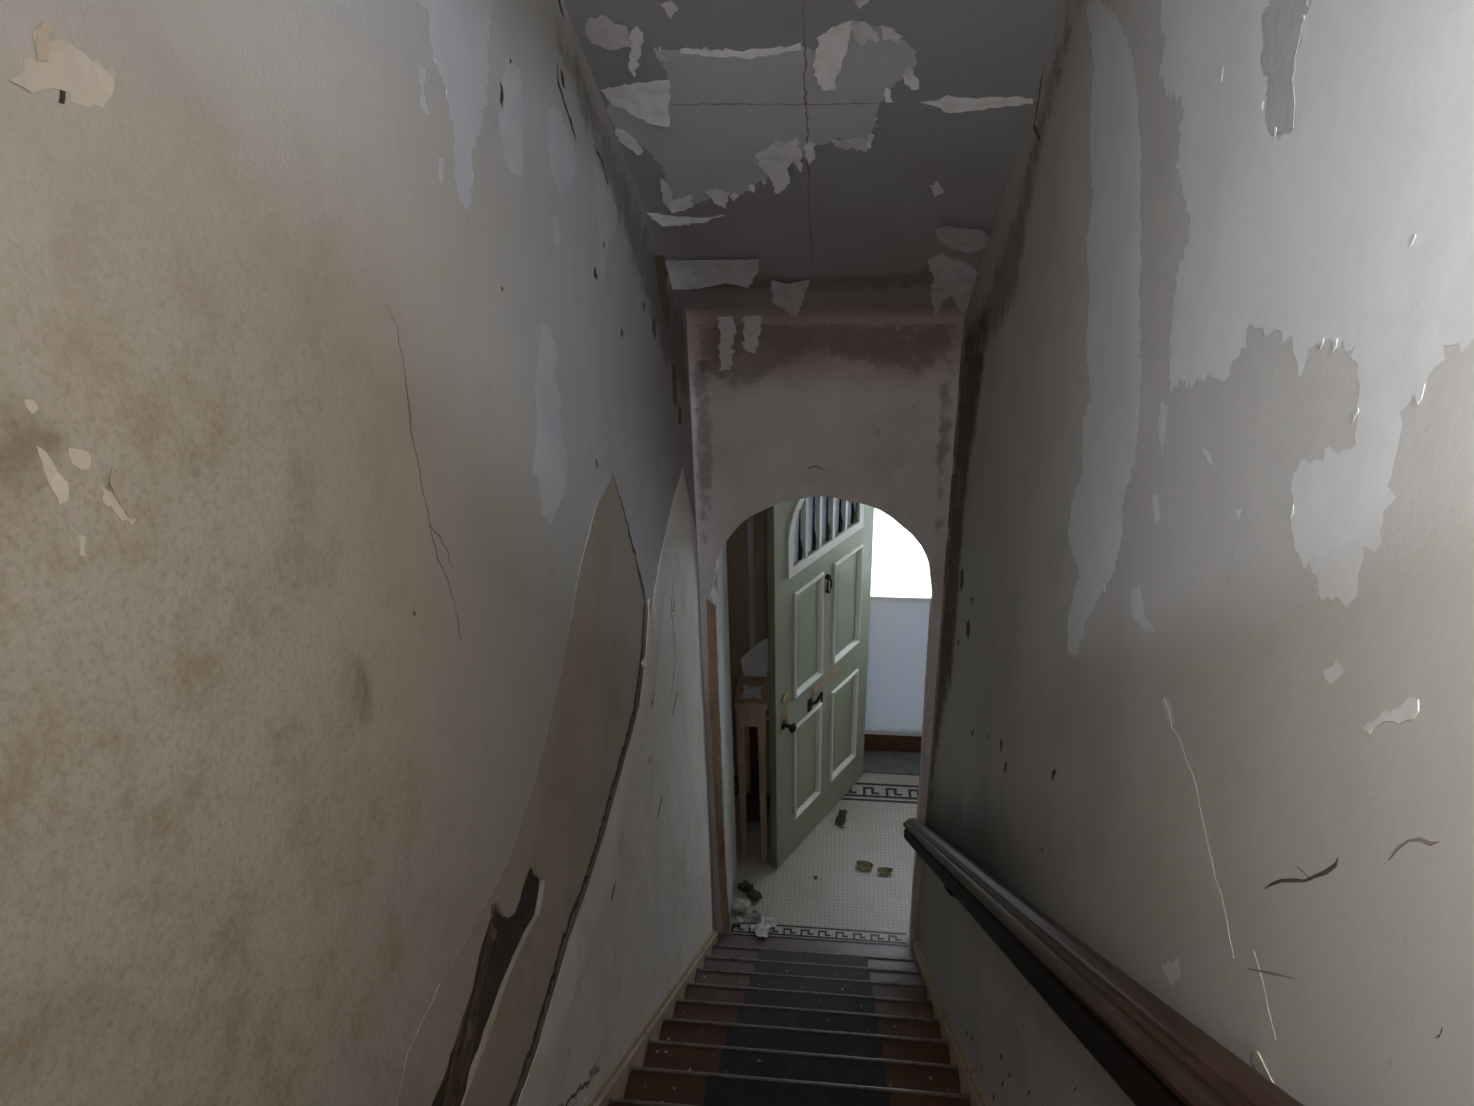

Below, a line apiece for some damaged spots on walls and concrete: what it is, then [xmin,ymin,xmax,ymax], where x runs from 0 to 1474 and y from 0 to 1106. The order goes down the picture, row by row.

peeling [9,22,116,108]
peeling [419,0,524,210]
peeling [585,0,917,227]
peeling [919,95,1033,113]
peeling [594,165,618,283]
peeling [1067,0,1142,659]
peeling [1158,0,1474,607]
peeling [37,446,91,505]
crack [385,303,461,641]
spalling [396,458,644,1106]
crack [1264,858,1338,889]
crack [1388,837,1438,861]